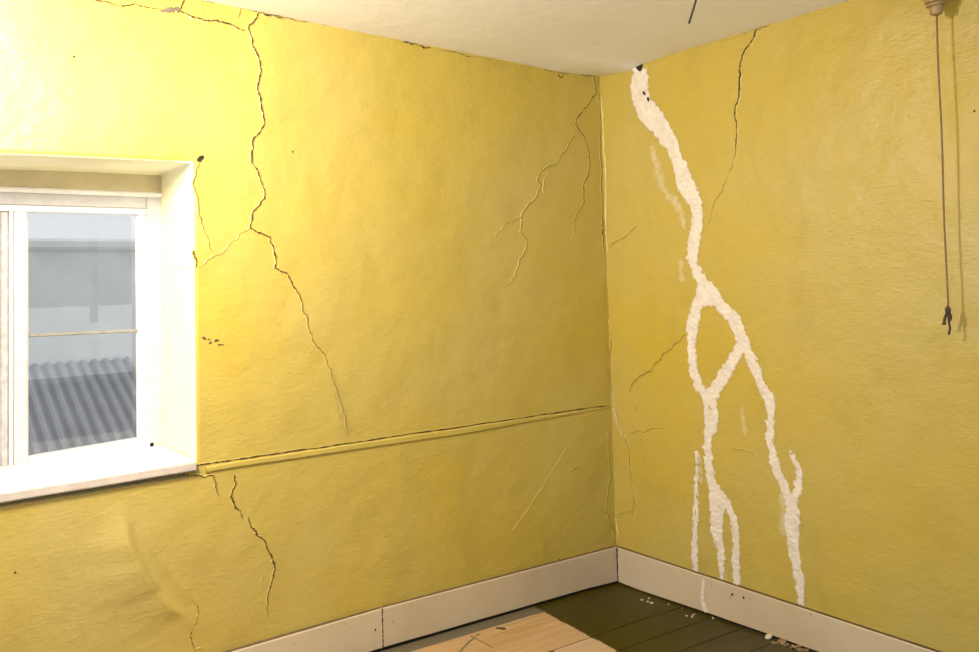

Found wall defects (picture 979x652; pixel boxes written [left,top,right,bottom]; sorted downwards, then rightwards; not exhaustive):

crack [84,0,686,617]
crack [644,25,770,224]